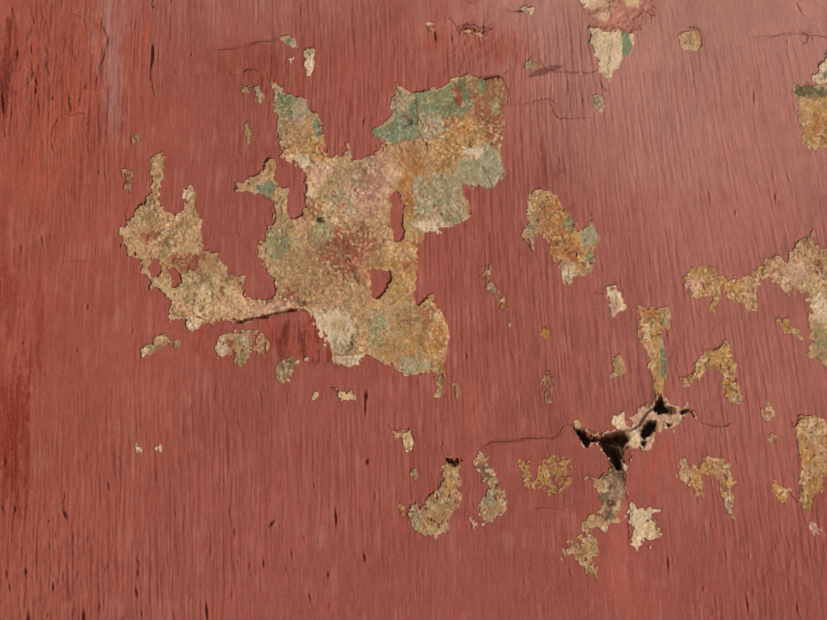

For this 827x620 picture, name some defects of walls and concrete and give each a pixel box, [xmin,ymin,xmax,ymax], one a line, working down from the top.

flaking render [580,0,658,82]
crack [50,89,89,154]
peeling [791,54,827,151]
peeling [119,74,508,398]
peeling [521,189,599,286]
peeling [683,230,827,368]
peeling [679,340,742,404]
peeling [398,450,510,540]
flaking render [560,285,697,579]
crack [624,452,662,542]
peeling [675,456,737,519]
peeling [772,415,827,537]